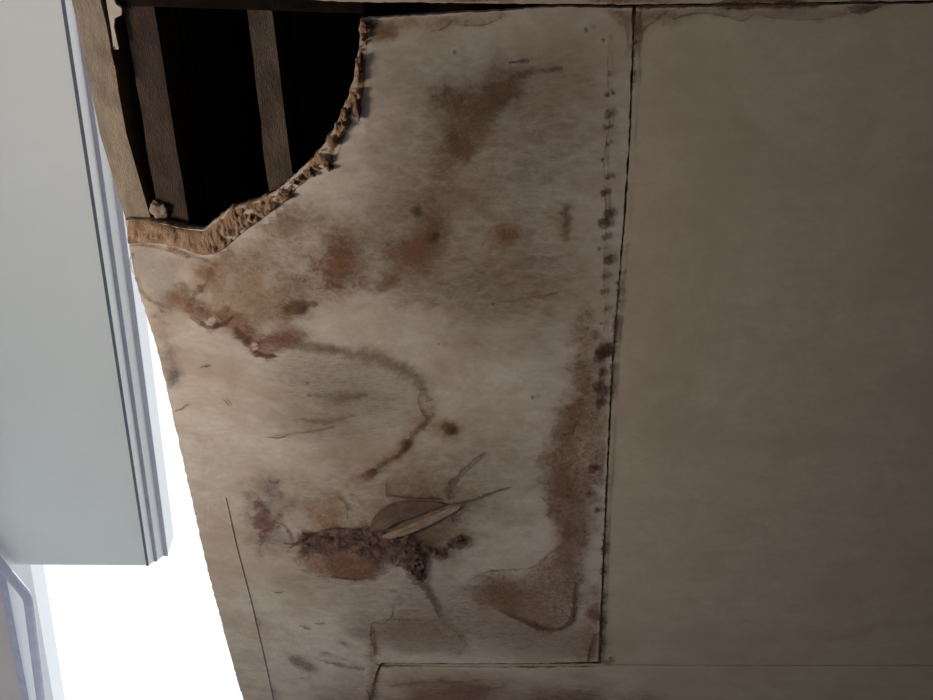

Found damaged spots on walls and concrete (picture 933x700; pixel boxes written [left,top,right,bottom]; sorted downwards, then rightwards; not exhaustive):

spalling [127,15,373,255]
water stain [598,174,613,311]
crack [361,388,430,479]
water stain [592,323,612,408]
peeling [283,452,509,618]